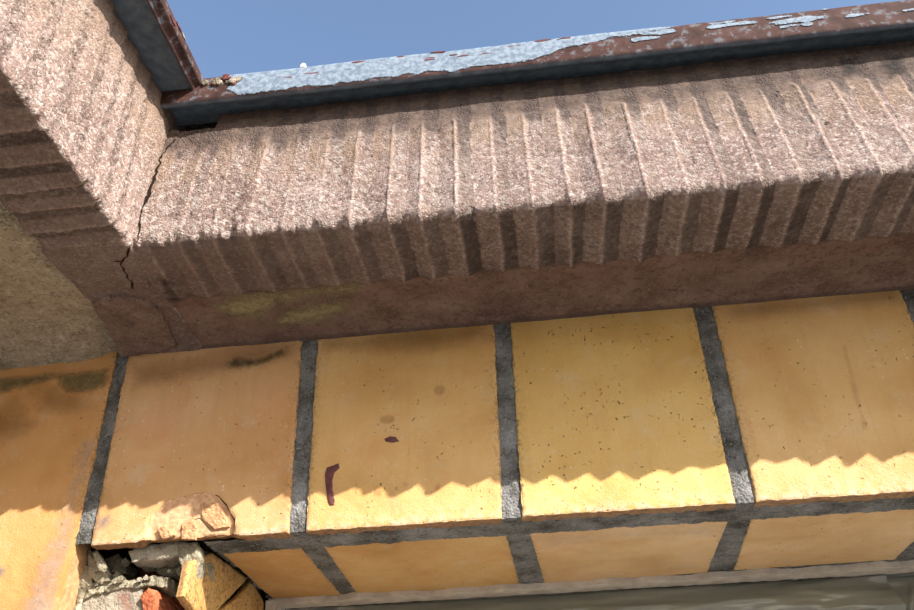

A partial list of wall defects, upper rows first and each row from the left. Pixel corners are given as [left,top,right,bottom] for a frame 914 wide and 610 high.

crack [115,139,176,289]
water stain [0,370,107,390]
spalling [73,492,247,610]